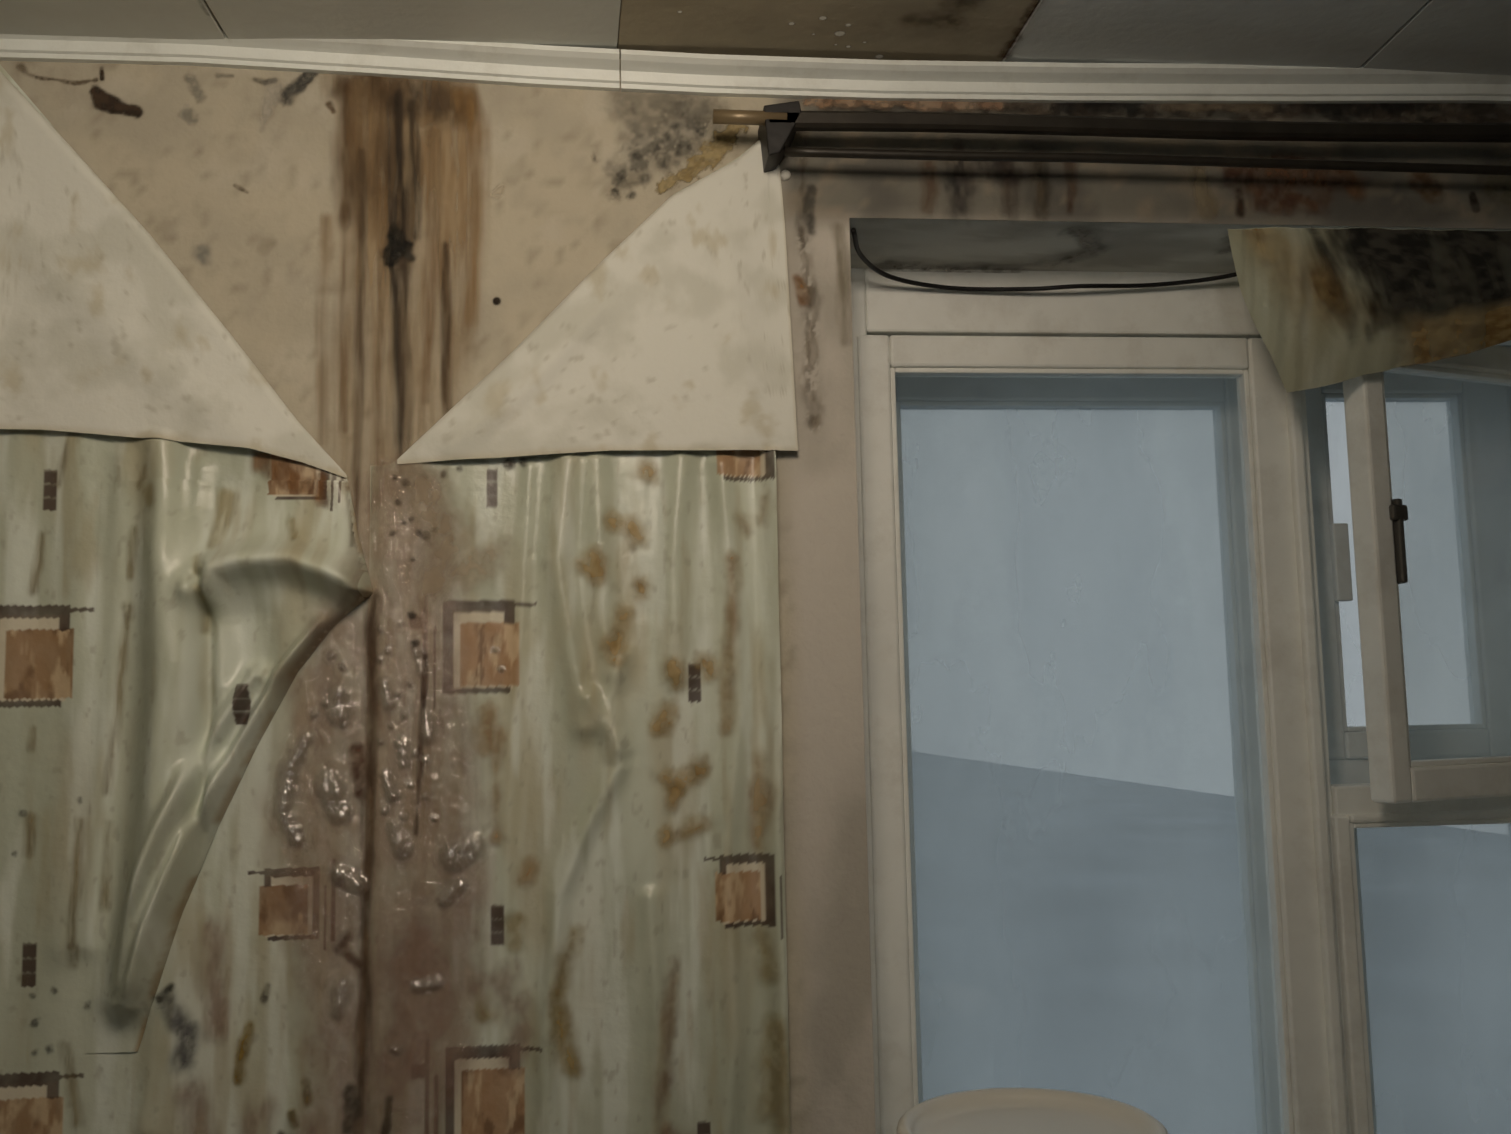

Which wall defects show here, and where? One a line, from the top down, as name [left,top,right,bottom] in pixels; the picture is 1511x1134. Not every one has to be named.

flaking render [90,69,143,118]
damp [263,72,317,119]
damp [326,76,476,447]